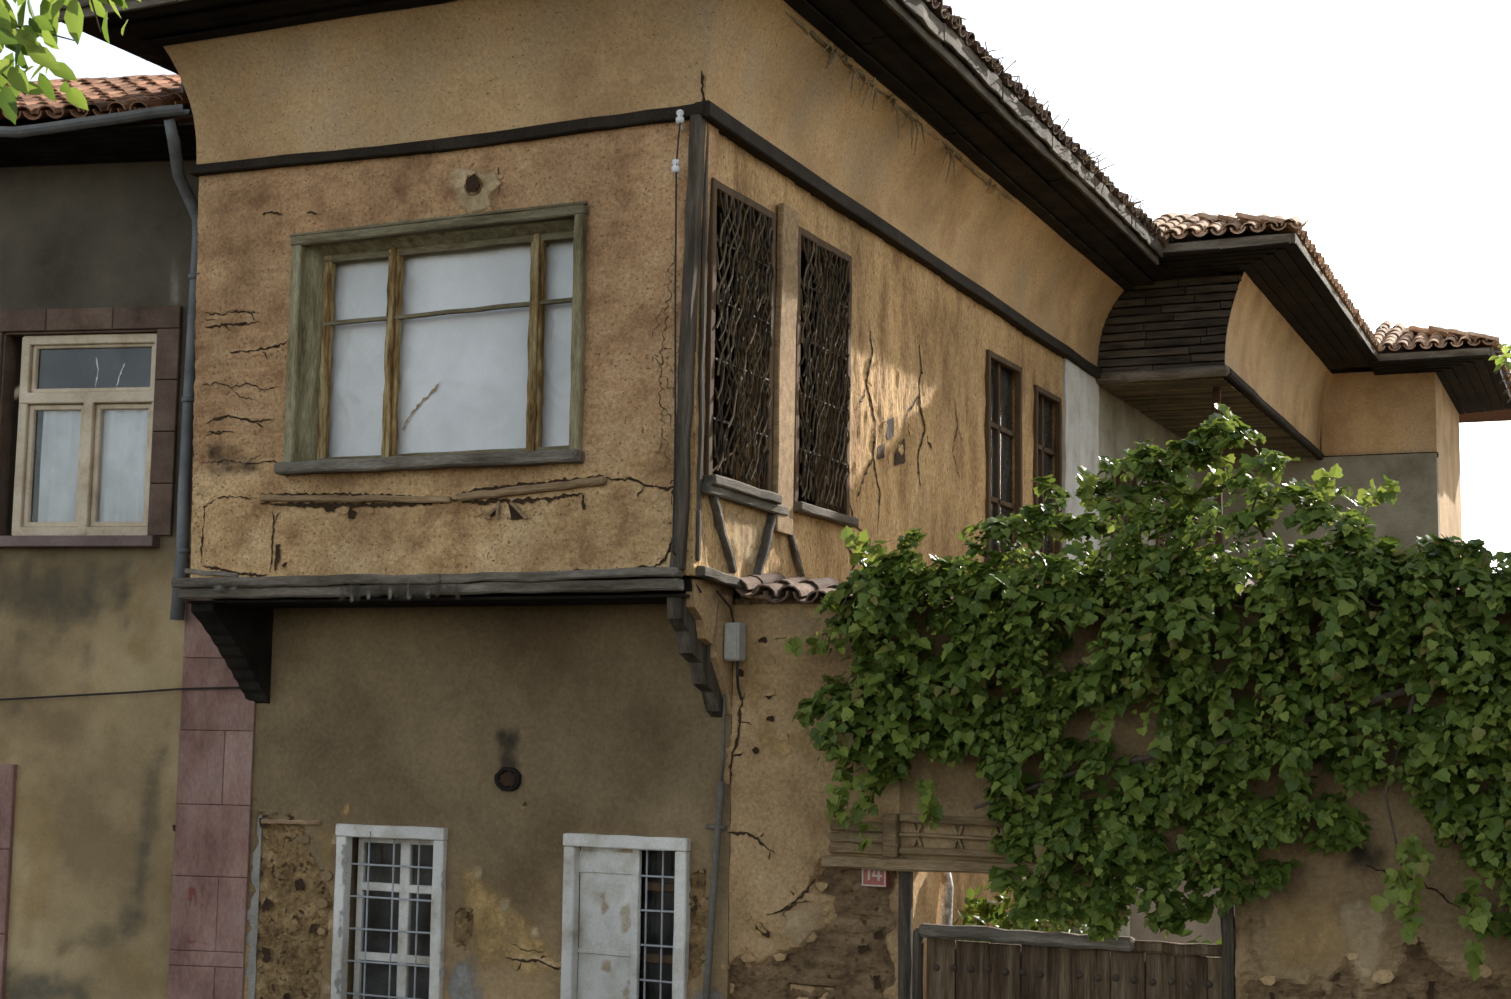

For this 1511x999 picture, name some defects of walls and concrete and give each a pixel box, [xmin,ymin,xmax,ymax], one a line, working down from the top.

flaking render [451,168,504,215]
crack [200,303,290,577]
crack [847,317,963,577]
flaking render [259,474,608,520]
flaking render [274,544,287,571]
crack [724,691,752,784]
flaking render [255,815,346,999]
flaking render [688,867,897,999]
flaking render [1235,903,1511,999]